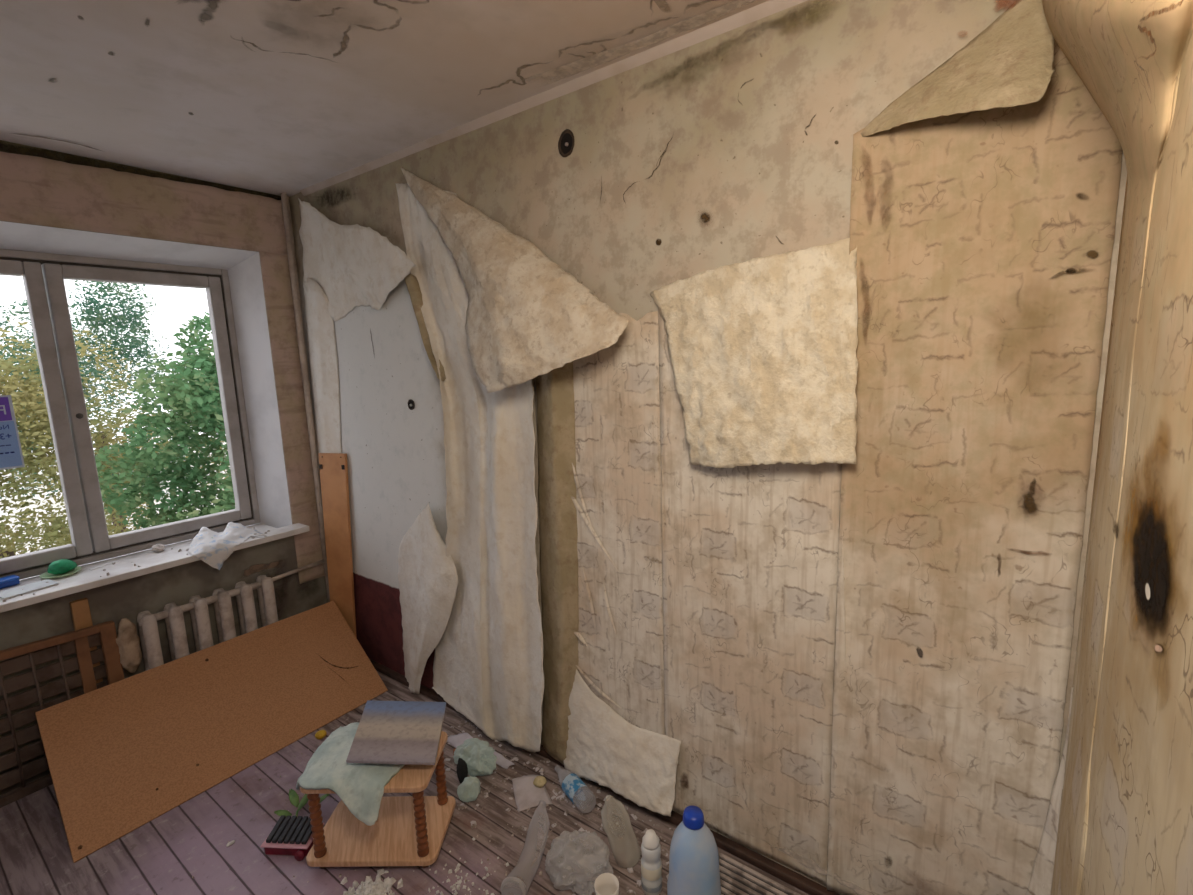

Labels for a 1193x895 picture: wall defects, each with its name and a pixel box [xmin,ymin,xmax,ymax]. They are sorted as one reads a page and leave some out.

leakage [199,0,219,22]